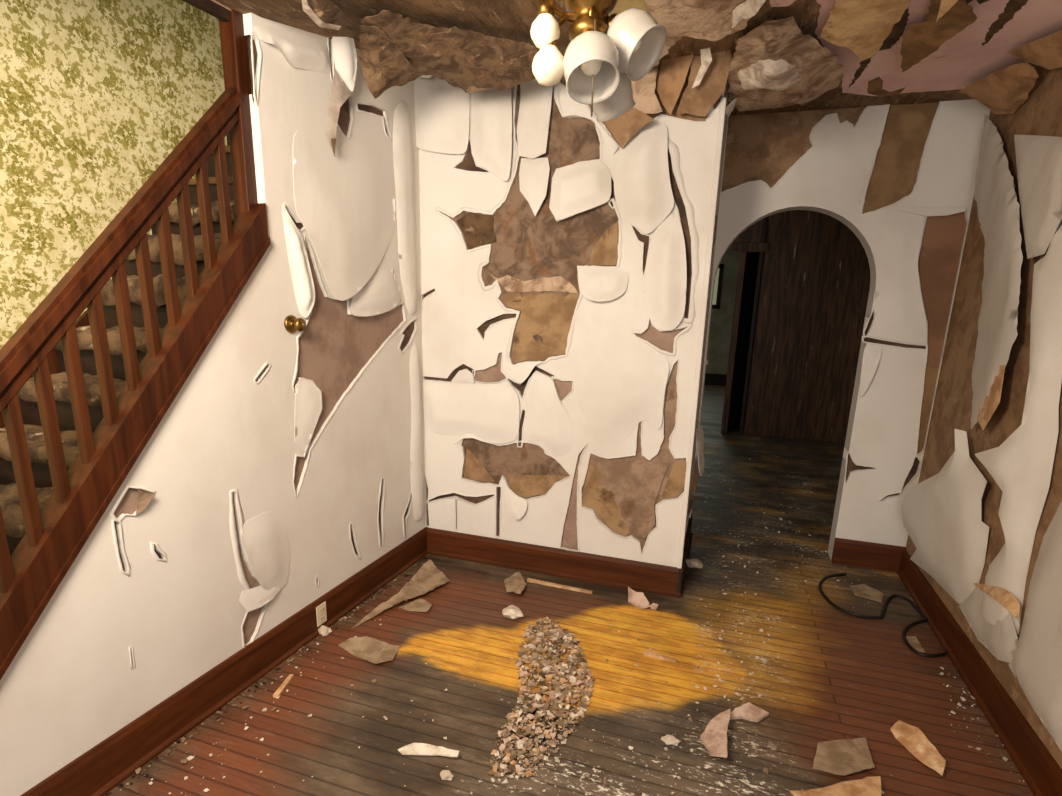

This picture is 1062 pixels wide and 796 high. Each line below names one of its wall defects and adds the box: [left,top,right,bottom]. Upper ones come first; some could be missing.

peeling [337,94,354,140]
peeling [292,233,417,498]
peeling [434,76,622,384]
peeling [454,317,698,555]
peeling [645,67,723,126]
peeling [721,0,989,494]
peeling [981,0,1028,46]